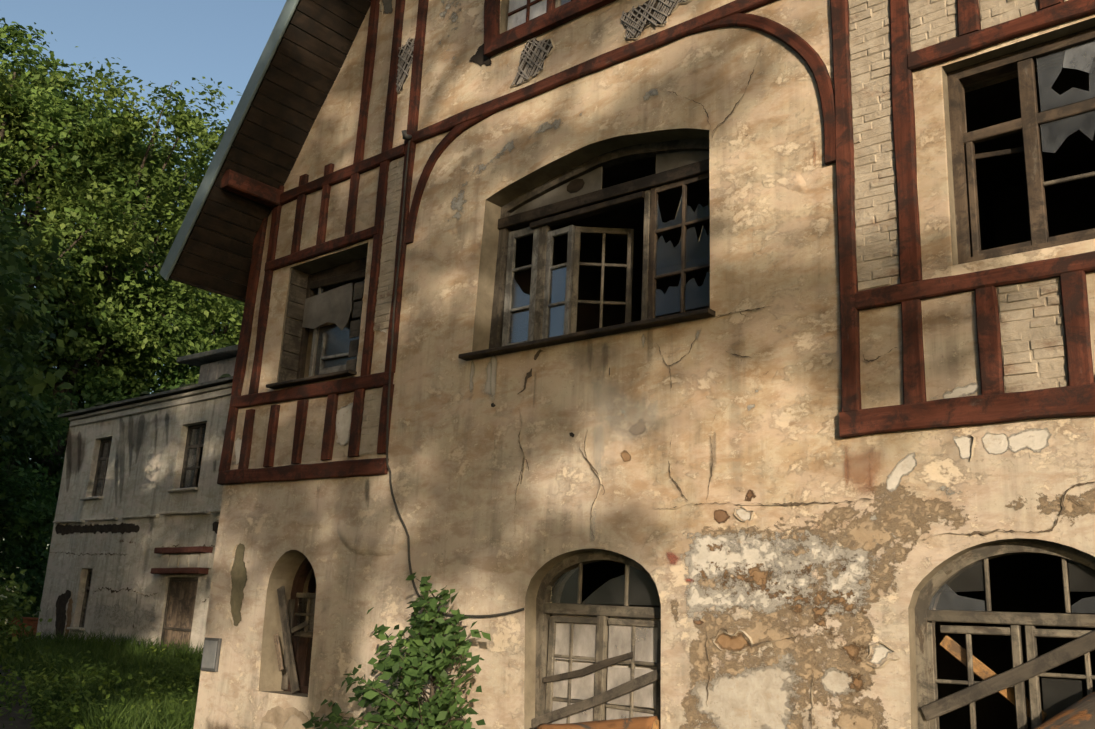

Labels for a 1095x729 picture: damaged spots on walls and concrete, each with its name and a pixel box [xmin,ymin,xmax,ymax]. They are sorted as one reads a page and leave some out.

spalling [469,44,492,66]
crack [668,47,764,138]
crack [657,306,771,391]
spalling [55,523,140,543]
crack [514,349,548,527]
crack [579,430,605,538]
crack [653,415,898,565]
flaking render [953,428,1052,461]
flaking render [1005,488,1095,526]
flaking render [670,452,977,729]